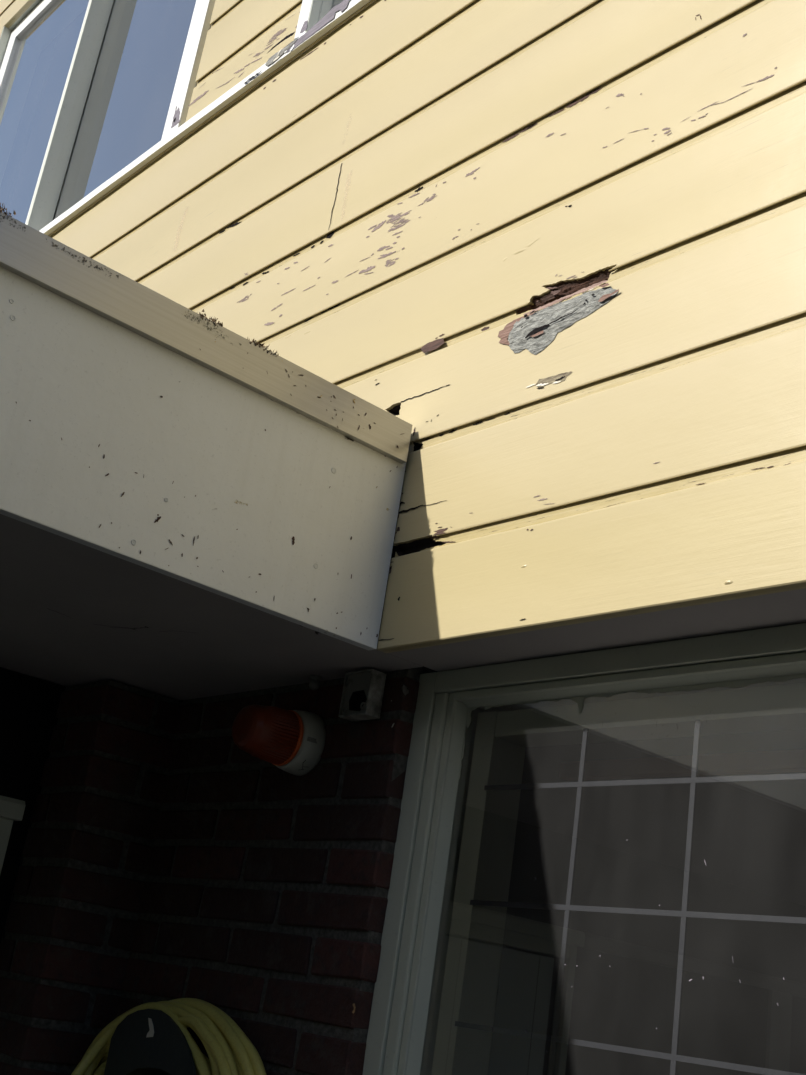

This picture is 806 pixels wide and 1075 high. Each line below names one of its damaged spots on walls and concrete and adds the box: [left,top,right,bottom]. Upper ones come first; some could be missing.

peeling [171,0,349,128]
peeling [304,181,446,322]
spalling [515,266,618,328]
spalling [526,372,572,389]
crack [399,500,447,514]